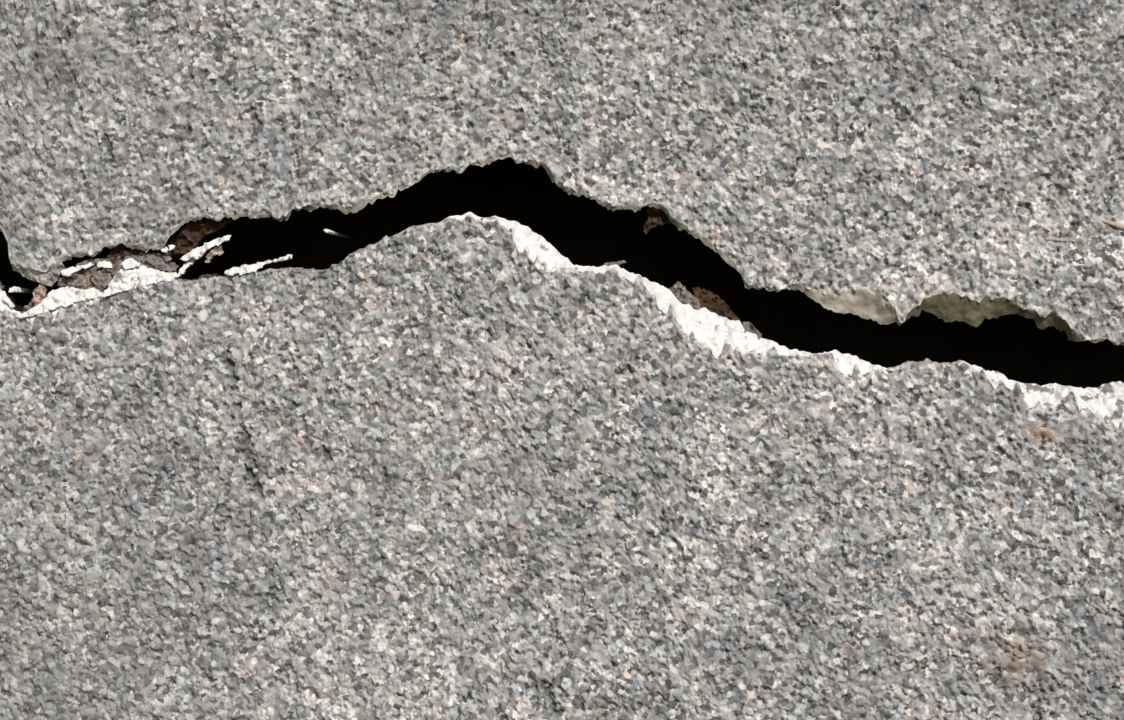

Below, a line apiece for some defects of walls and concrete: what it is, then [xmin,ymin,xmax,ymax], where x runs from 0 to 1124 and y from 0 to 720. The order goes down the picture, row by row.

crack [0,153,1124,389]